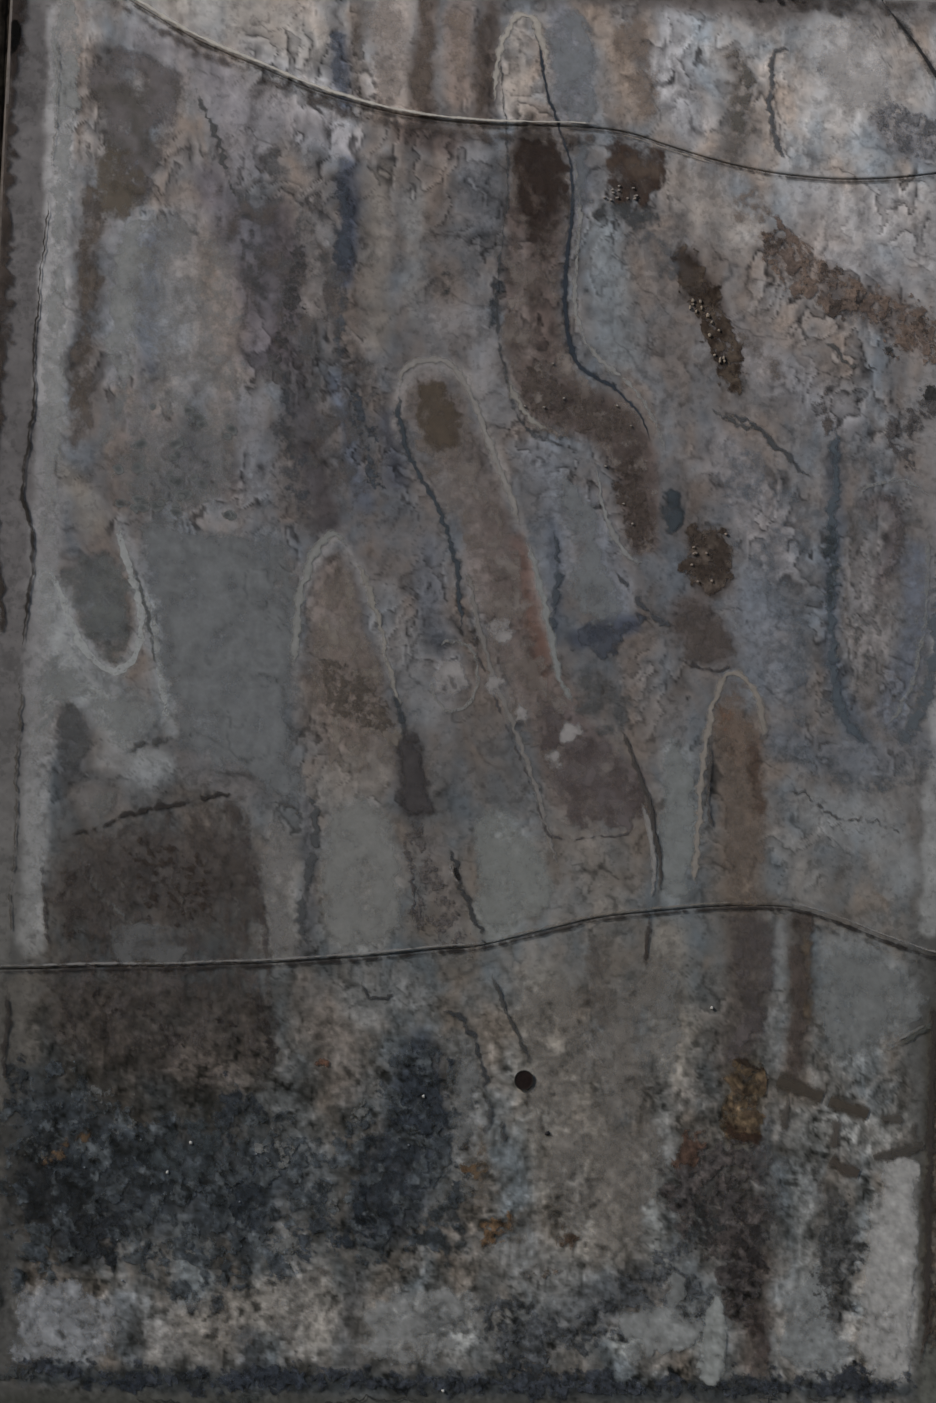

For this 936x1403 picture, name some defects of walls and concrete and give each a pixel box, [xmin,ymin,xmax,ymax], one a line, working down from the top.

crack [113,0,923,182]
crack [891,13,936,77]
corrosion [761,213,936,365]
crack [20,211,49,644]
crack [8,685,23,929]
leakage [0,519,928,1403]
crack [1,732,936,1076]
crack [483,1099,507,1143]
corrosion [671,1058,769,1171]
corrosion [921,1009,936,1354]